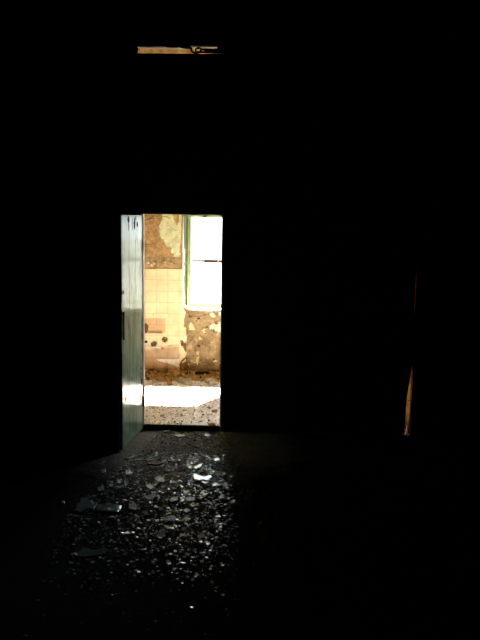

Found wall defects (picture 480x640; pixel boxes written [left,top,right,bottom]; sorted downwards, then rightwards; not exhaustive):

spalling [144,214,187,268]
spalling [179,293,221,371]